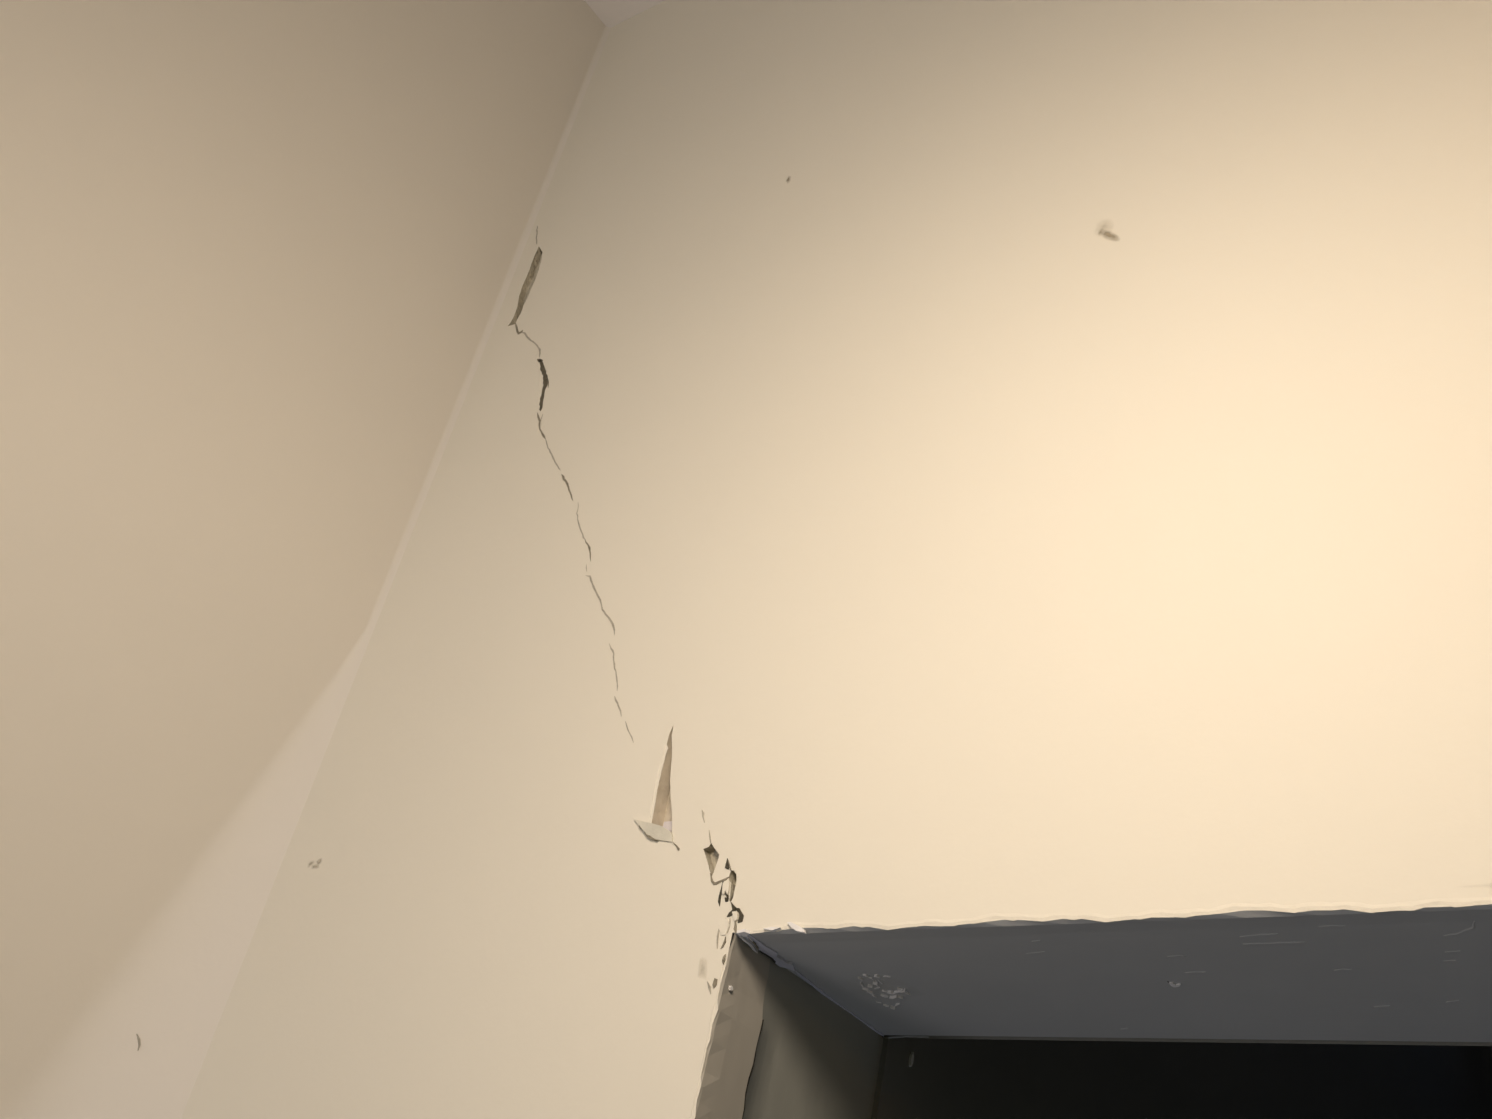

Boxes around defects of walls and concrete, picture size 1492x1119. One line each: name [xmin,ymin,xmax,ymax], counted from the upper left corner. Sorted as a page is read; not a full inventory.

crack [515,323,634,743]
crack [639,826,680,851]
spalling [689,831,884,1119]